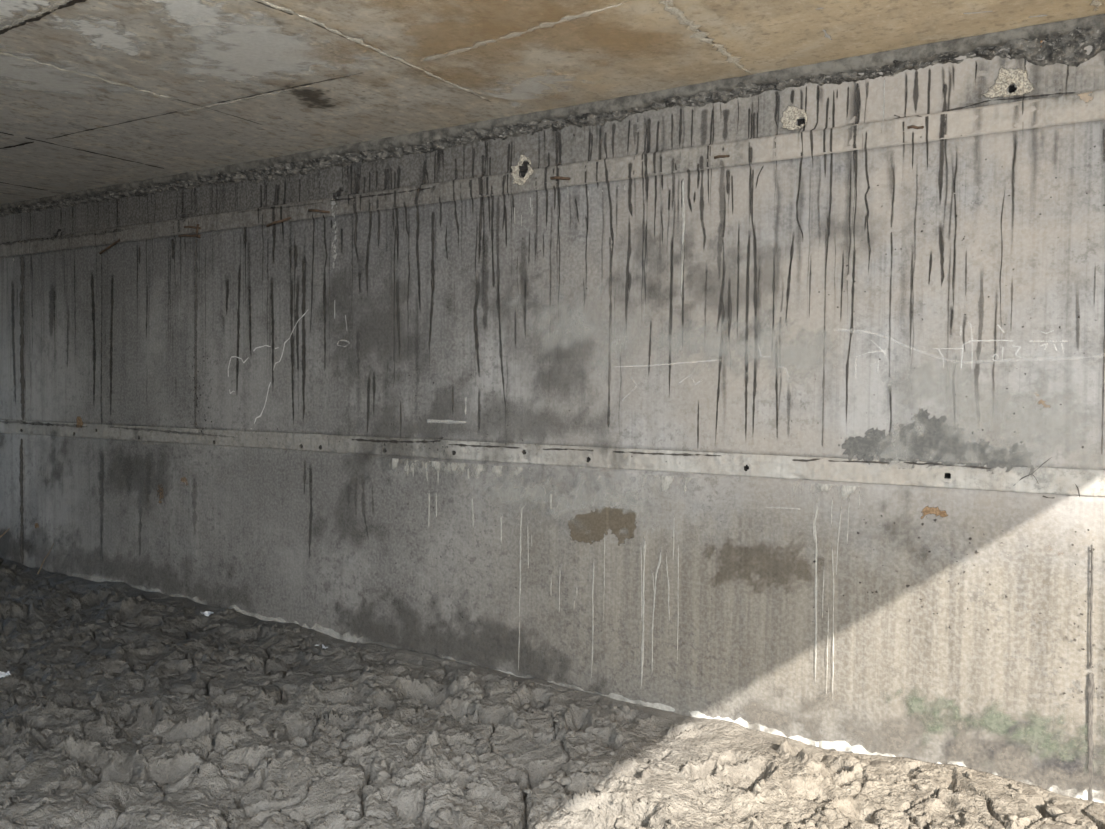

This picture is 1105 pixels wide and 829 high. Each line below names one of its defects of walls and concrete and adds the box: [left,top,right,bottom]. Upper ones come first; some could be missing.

leakage [226,181,286,392]
peeling [151,0,368,83]
leakage [289,98,763,438]
spalling [0,27,1105,217]
leakage [771,84,871,435]
leakage [903,68,967,342]
leakage [1001,145,1016,235]
leakage [838,369,1034,475]
leakage [337,458,638,695]
leakage [641,517,679,687]
leakage [690,484,932,757]
leakage [938,721,1105,804]